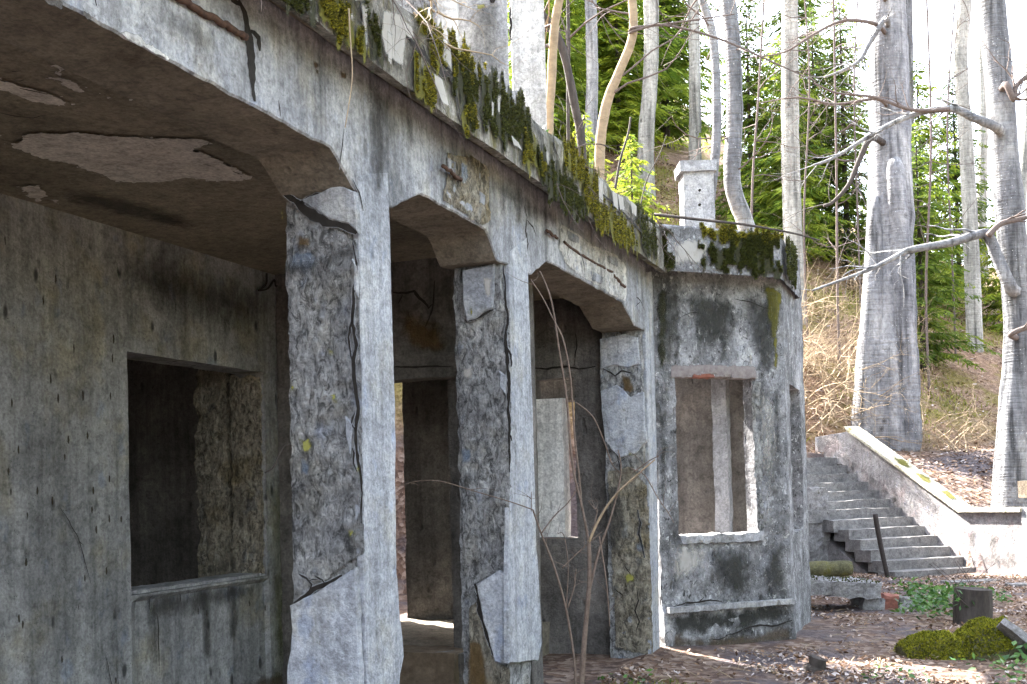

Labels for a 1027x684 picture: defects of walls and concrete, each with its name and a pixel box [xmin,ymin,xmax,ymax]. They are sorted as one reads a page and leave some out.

rust [175,0,249,41]
peeling [0,65,87,106]
peeling [0,132,253,183]
crack [283,130,364,523]
spalling [286,209,365,600]